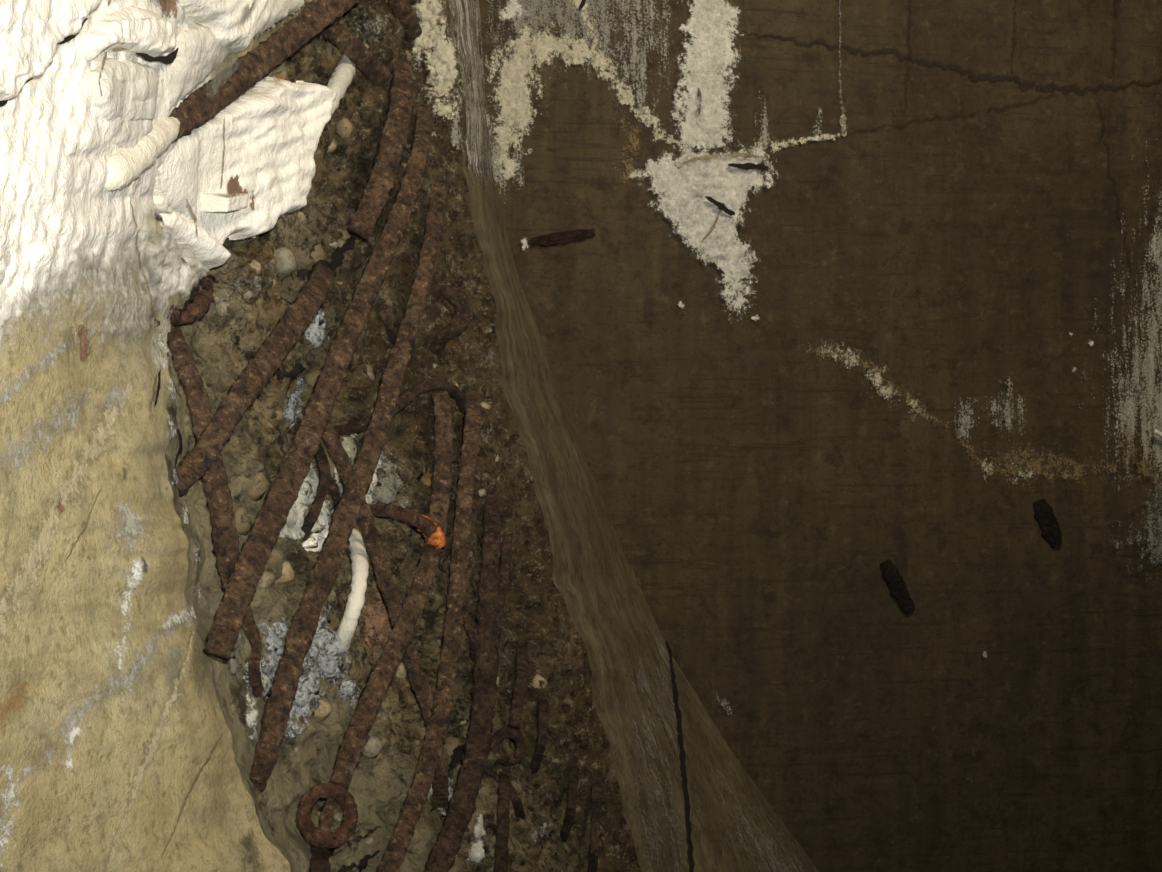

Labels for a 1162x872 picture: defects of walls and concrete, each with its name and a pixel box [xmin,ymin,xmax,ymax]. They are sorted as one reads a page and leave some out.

crack [741,31,1162,96]
rust [226,175,255,210]
damp [411,0,778,322]
crack [734,90,847,157]
damp [1093,188,1162,583]
spalling [165,0,642,872]
rust [356,582,392,659]